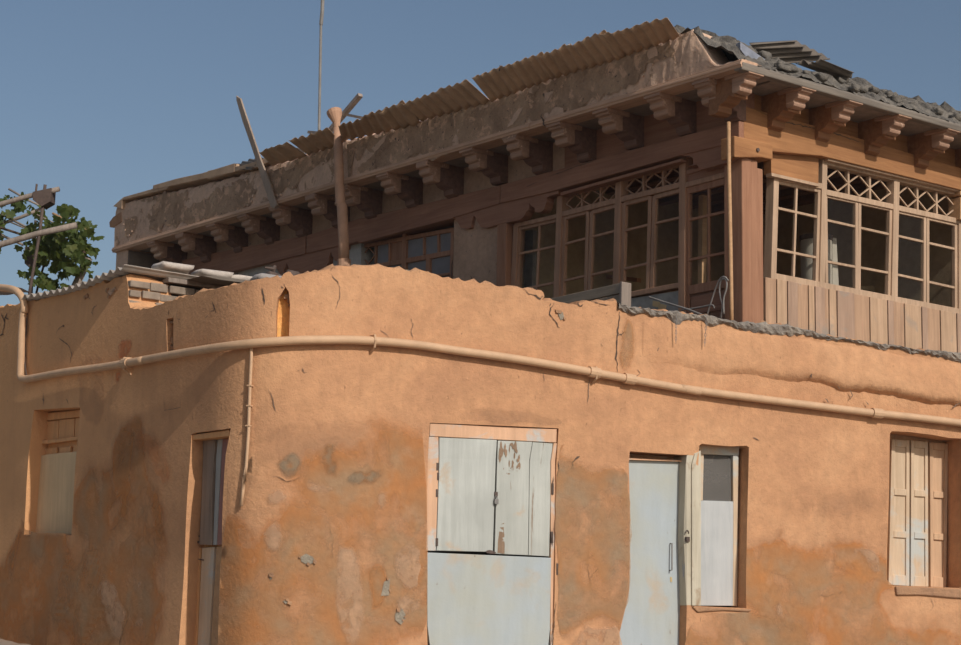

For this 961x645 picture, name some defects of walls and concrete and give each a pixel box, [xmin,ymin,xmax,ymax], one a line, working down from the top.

flaking render [149,178,257,233]
flaking render [267,147,334,198]
crack [578,301,639,376]
water stain [0,421,169,645]
water stain [218,429,428,645]
water stain [555,460,632,645]
water stain [685,541,961,645]